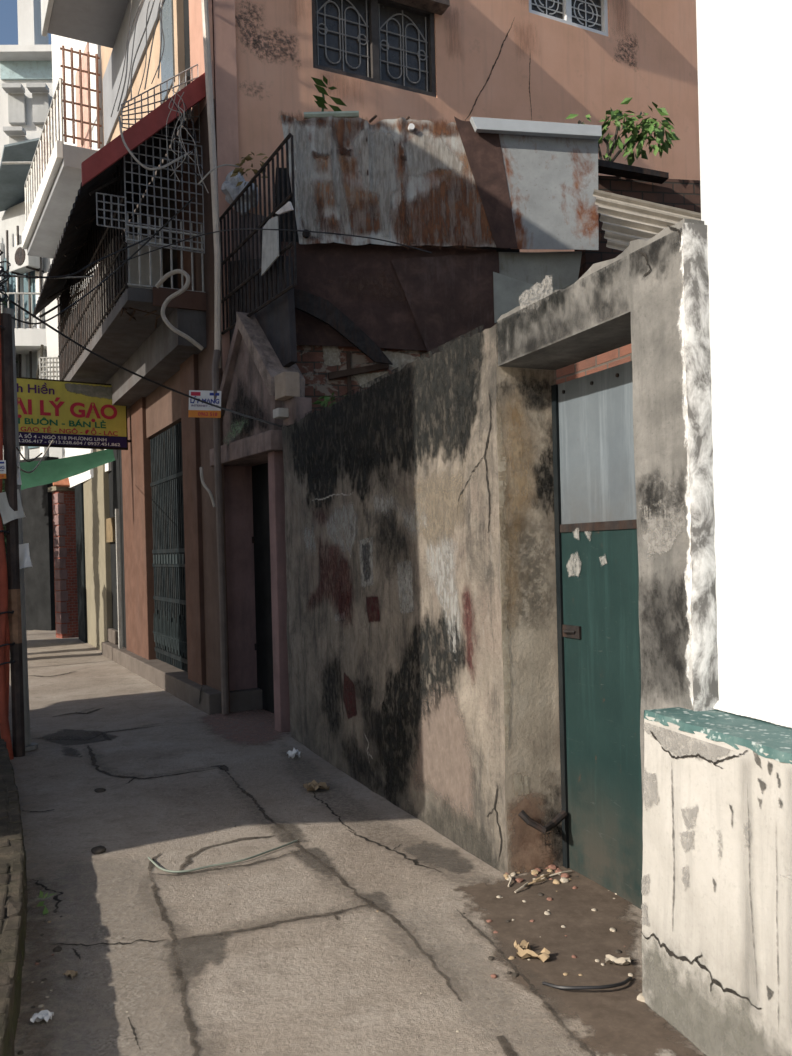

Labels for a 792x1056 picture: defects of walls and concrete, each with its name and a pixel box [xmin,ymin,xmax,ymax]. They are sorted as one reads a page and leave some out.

rust [281,113,496,248]
damp [581,229,681,320]
spalling [353,351,427,388]
damp [287,286,580,514]
crack [457,396,491,533]
damp [321,615,496,867]
peeling [643,770,659,806]
peeling [753,752,782,807]
crack [32,708,461,1056]
crack [640,731,779,1020]
crack [457,910,595,1056]
damp [642,948,776,1056]